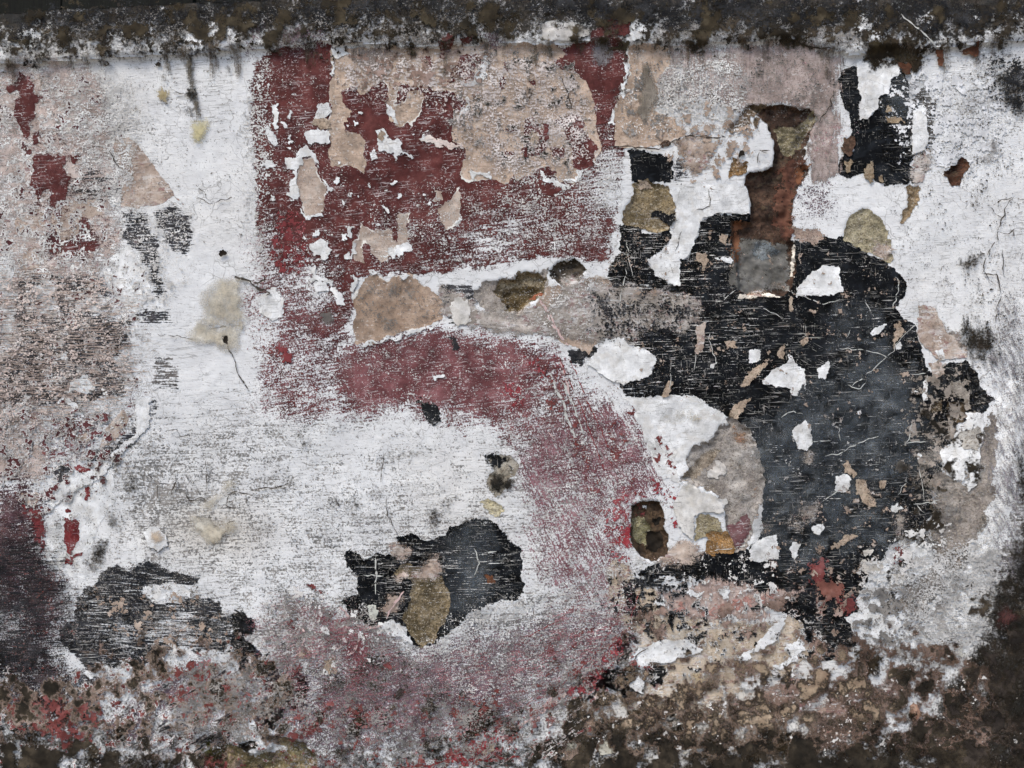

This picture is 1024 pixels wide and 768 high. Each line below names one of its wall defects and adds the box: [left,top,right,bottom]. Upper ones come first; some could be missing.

leakage [739,31,787,53]
leakage [322,705,389,741]
leakage [421,706,524,758]